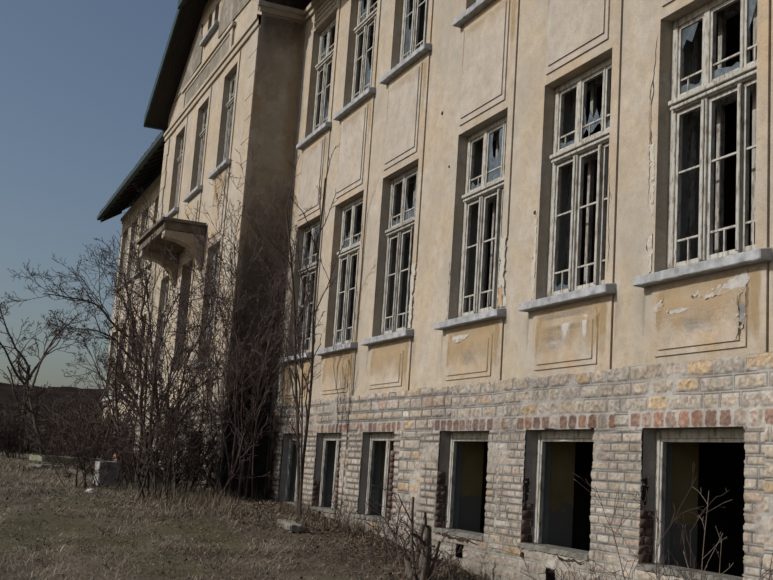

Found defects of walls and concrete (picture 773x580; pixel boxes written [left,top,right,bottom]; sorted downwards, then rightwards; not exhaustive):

crack [649,41,657,106]
flaking render [497,235,508,307]
flaking render [691,270,750,329]